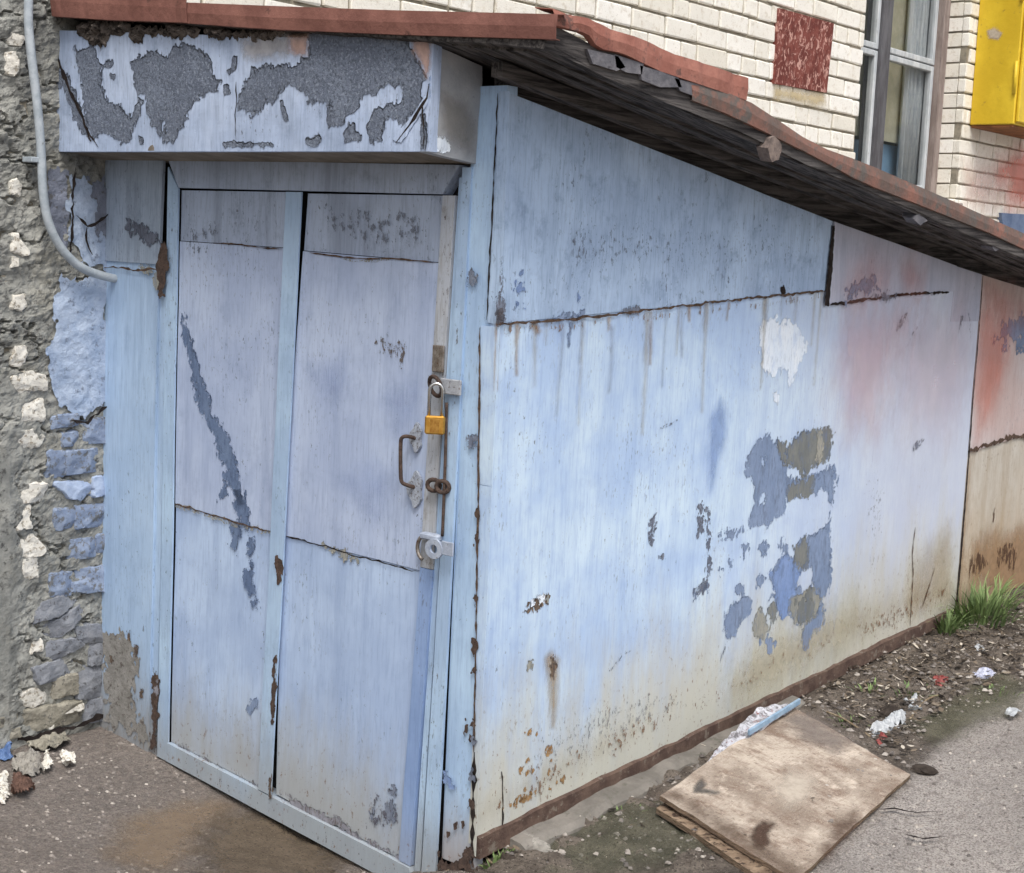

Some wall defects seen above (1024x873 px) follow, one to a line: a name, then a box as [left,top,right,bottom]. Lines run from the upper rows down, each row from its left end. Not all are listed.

peeling [56,20,451,154]
peeling [46,166,107,419]
crack [69,167,160,275]
rust [152,242,172,299]
rust [495,276,825,335]
peeling [180,312,261,609]
rust [274,555,284,585]
peeling [693,425,839,662]
peeling [101,626,150,748]
rust [149,672,163,752]
rust [270,655,278,725]
rust [495,699,675,810]